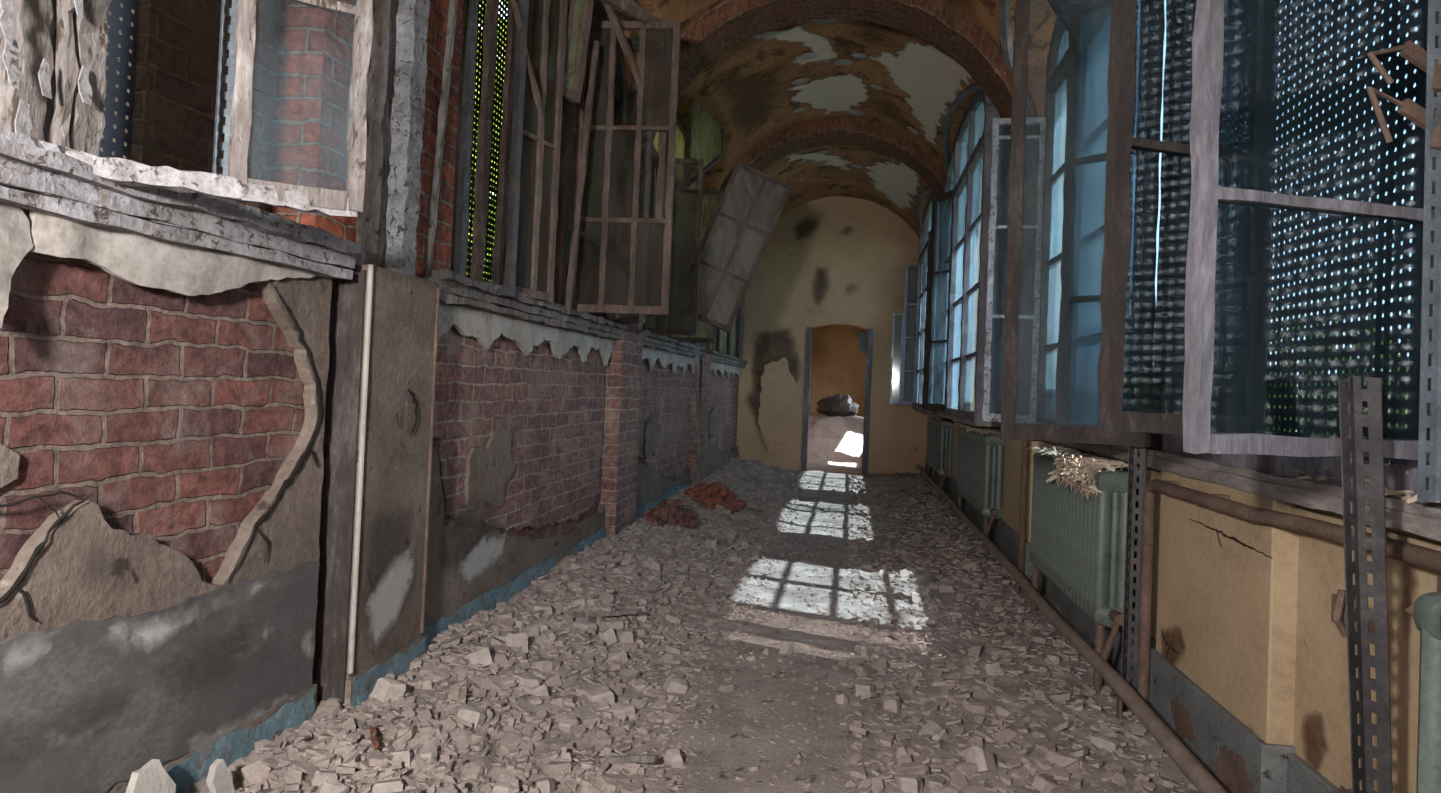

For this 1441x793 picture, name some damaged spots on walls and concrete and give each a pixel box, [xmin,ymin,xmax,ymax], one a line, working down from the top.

peeling [754,19,972,145]
peeling [784,150,926,212]
leakage [815,270,827,301]
spalling [0,204,318,583]
crack [228,286,324,584]
spalling [433,302,613,532]
leakage [750,331,799,424]
crack [0,491,93,622]
peeling [352,528,607,707]
rust [1162,630,1184,665]
crack [1190,519,1273,559]
rust [1304,718,1325,769]